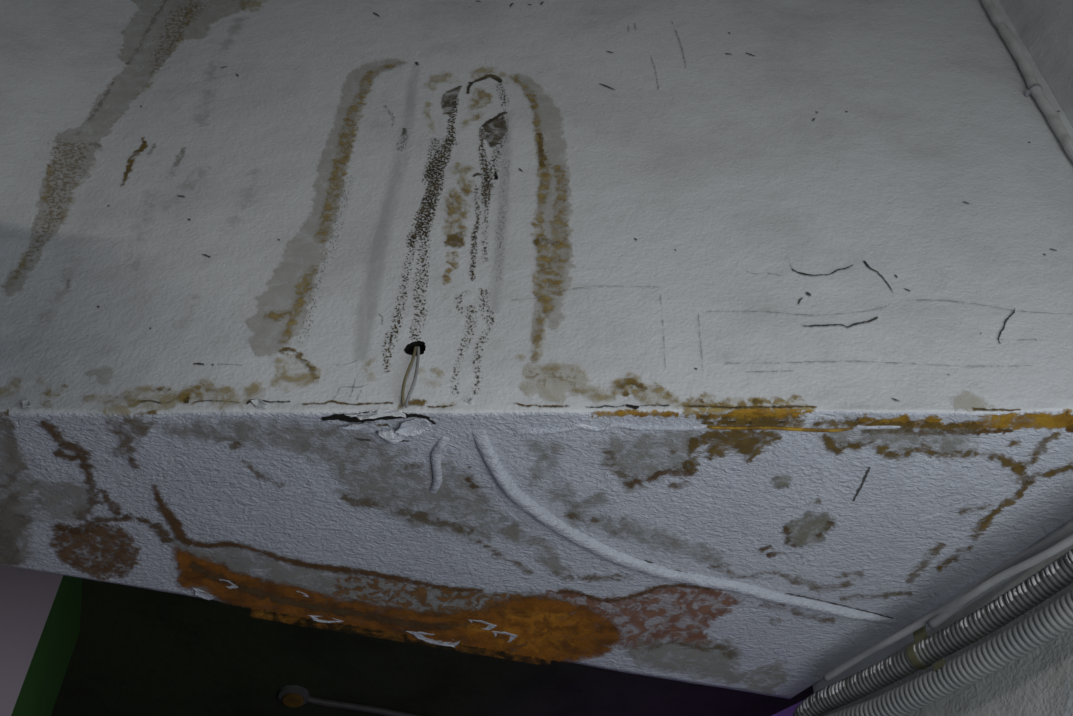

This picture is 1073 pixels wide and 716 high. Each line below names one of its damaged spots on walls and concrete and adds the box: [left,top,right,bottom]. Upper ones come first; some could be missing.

water stain [3,0,261,295]
water stain [247,59,400,385]
rust [0,409,739,662]
peeling [322,409,436,437]
water stain [367,67,612,401]
water stain [759,499,835,558]
crack [752,261,893,328]
rust [591,373,1073,583]
crack [922,299,1040,343]